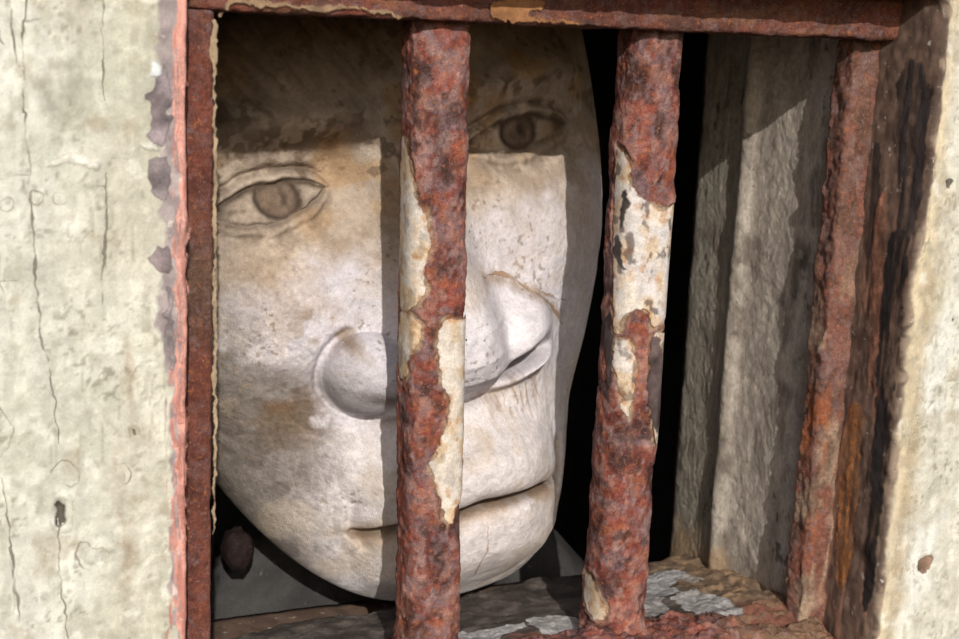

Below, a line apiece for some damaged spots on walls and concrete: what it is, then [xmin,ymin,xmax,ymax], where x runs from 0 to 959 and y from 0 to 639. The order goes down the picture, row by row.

crack [0,0,28,59]
peeling [145,50,187,200]
crack [0,205,43,347]
crack [101,172,109,268]
peeling [398,136,432,379]
peeling [429,315,466,524]
rust [604,313,614,402]
rust [613,190,631,270]
peeling [612,148,674,416]
rust [647,336,663,433]
rust [869,193,884,388]
crack [1,478,20,614]